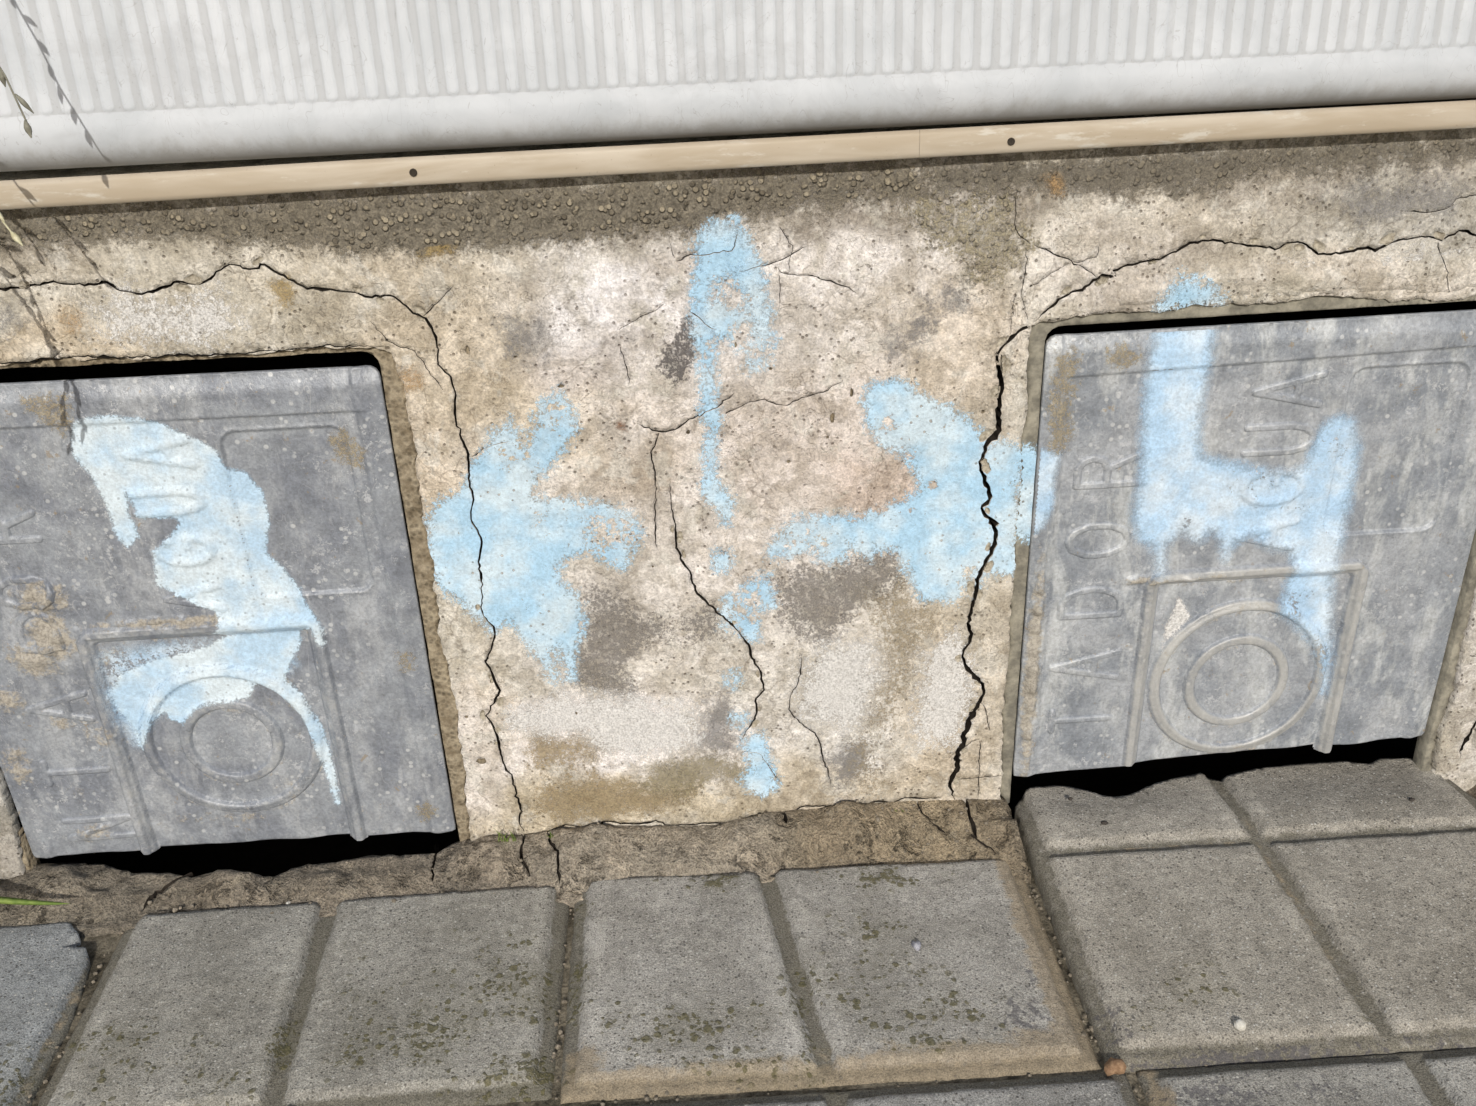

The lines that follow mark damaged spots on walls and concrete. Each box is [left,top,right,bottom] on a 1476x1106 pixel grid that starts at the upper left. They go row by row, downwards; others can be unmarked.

crack [669,228,856,298]
crack [0,257,724,884]
crack [637,382,841,824]
crack [873,193,1476,854]
crack [143,872,194,910]